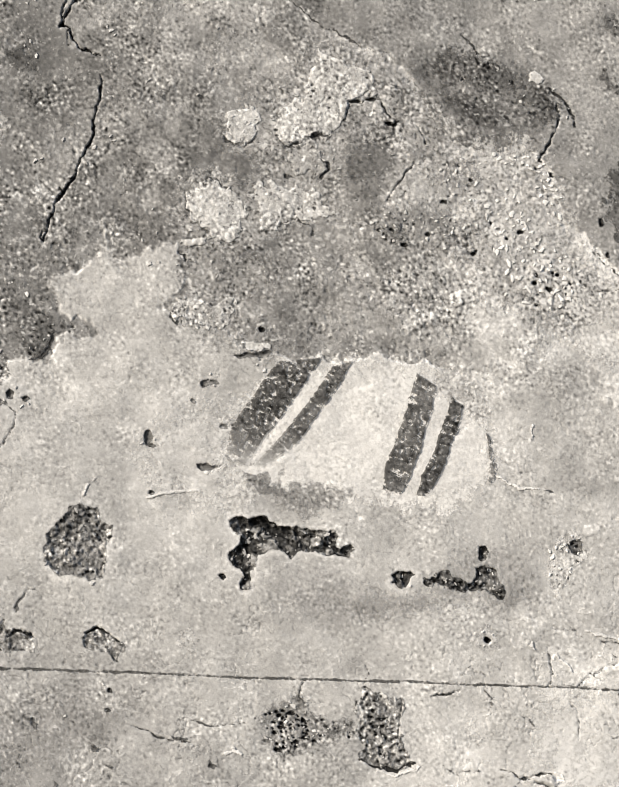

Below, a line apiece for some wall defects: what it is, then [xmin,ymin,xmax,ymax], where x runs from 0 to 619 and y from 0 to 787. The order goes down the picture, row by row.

damp [4,39,38,71]
crack [58,0,101,56]
crack [40,79,103,242]
crack [538,105,560,160]
damp [168,31,619,374]
damp [18,309,56,360]
damp [0,349,10,385]
flaking render [43,501,113,585]
spalling [392,569,501,596]
flaking render [82,627,126,662]
crack [0,641,619,734]
spalling [254,686,420,777]